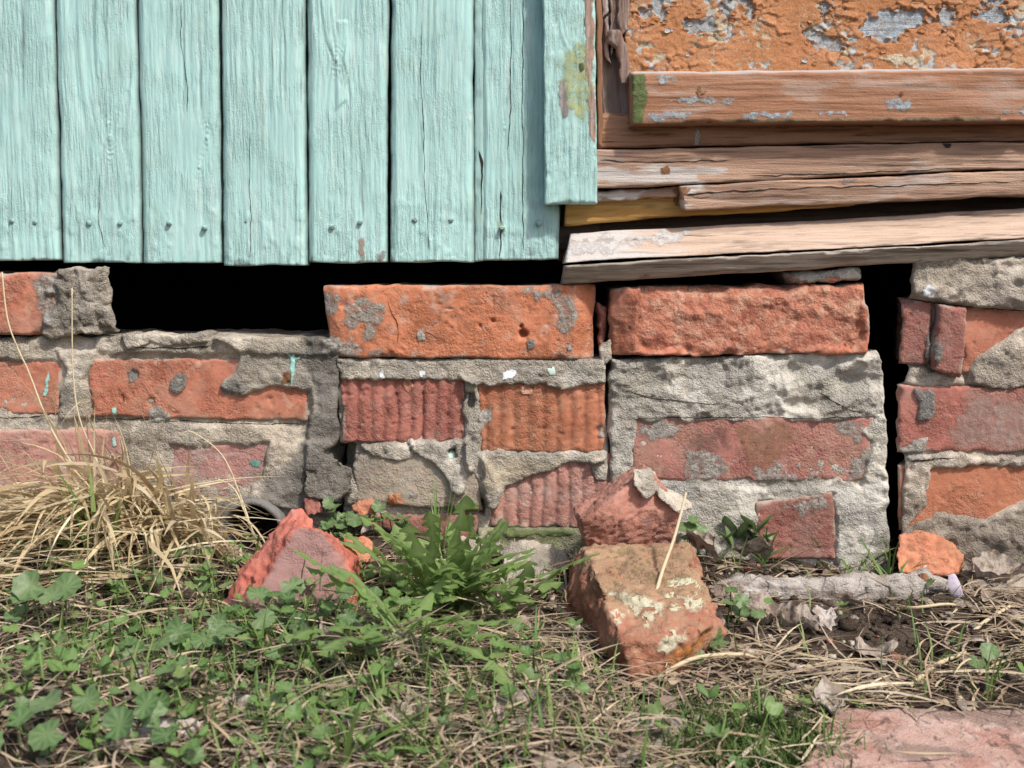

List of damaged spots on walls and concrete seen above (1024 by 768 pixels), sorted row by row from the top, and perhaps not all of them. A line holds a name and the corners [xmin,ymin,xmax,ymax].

peeling [636,0,763,37]
peeling [801,3,846,65]
peeling [858,0,1013,68]
crack [479,2,524,258]
peeling [648,96,734,122]
peeling [743,110,793,119]
peeling [885,98,911,110]